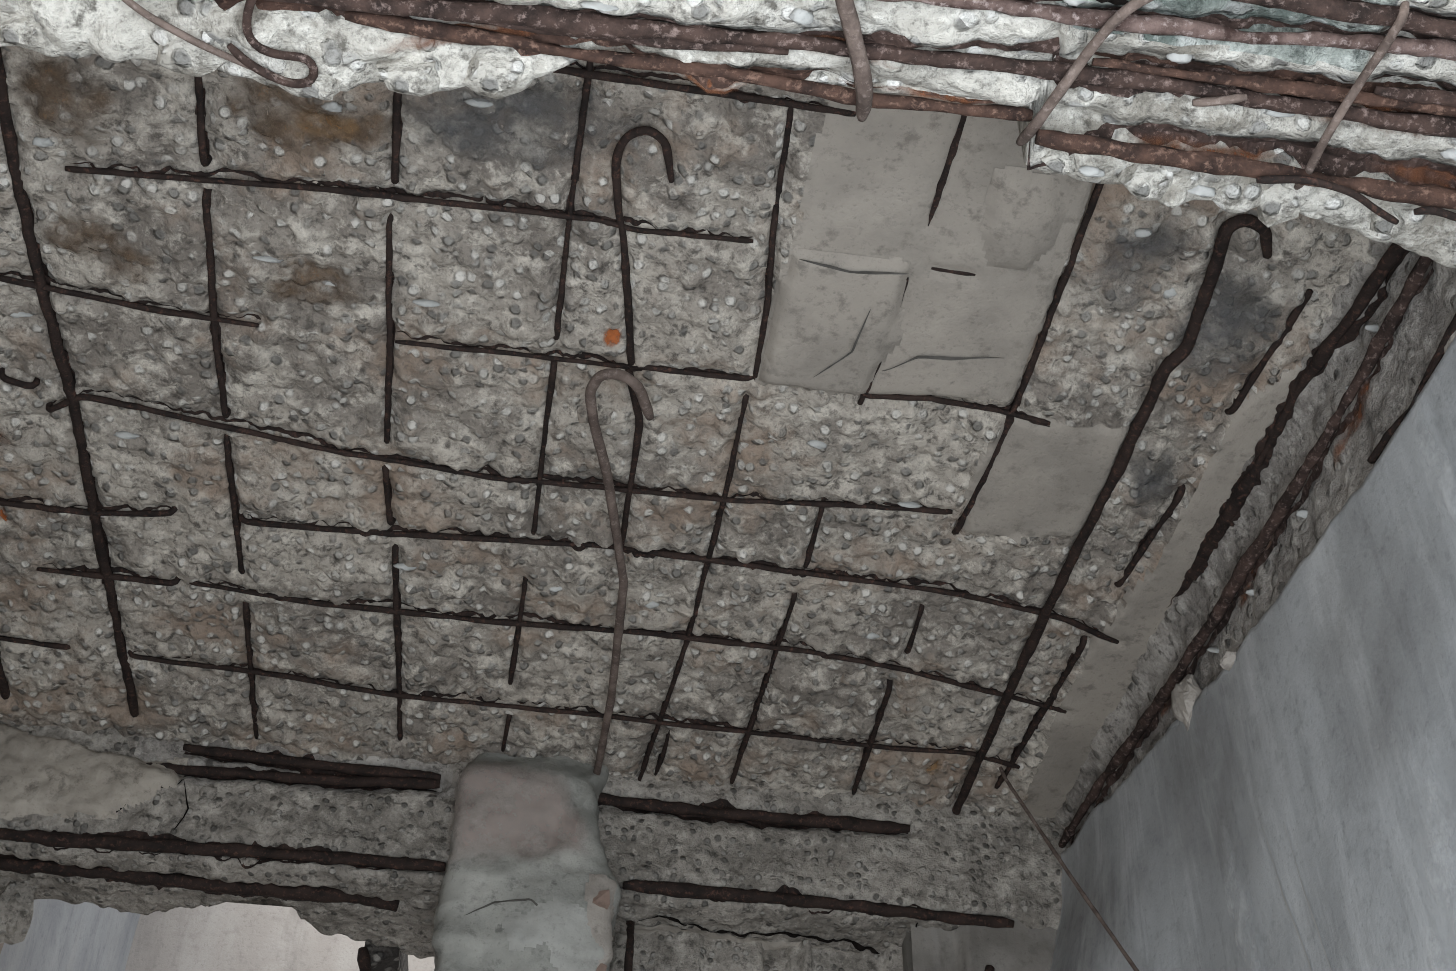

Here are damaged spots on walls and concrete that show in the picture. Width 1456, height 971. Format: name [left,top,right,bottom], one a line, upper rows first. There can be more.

spalling [854,0,1456,92]
rust [229,81,392,152]
rust [910,89,990,103]
spalling [1040,87,1332,169]
spalling [1327,120,1456,167]
rust [604,329,621,346]
spalling [0,0,1080,820]
spalling [963,135,1456,841]